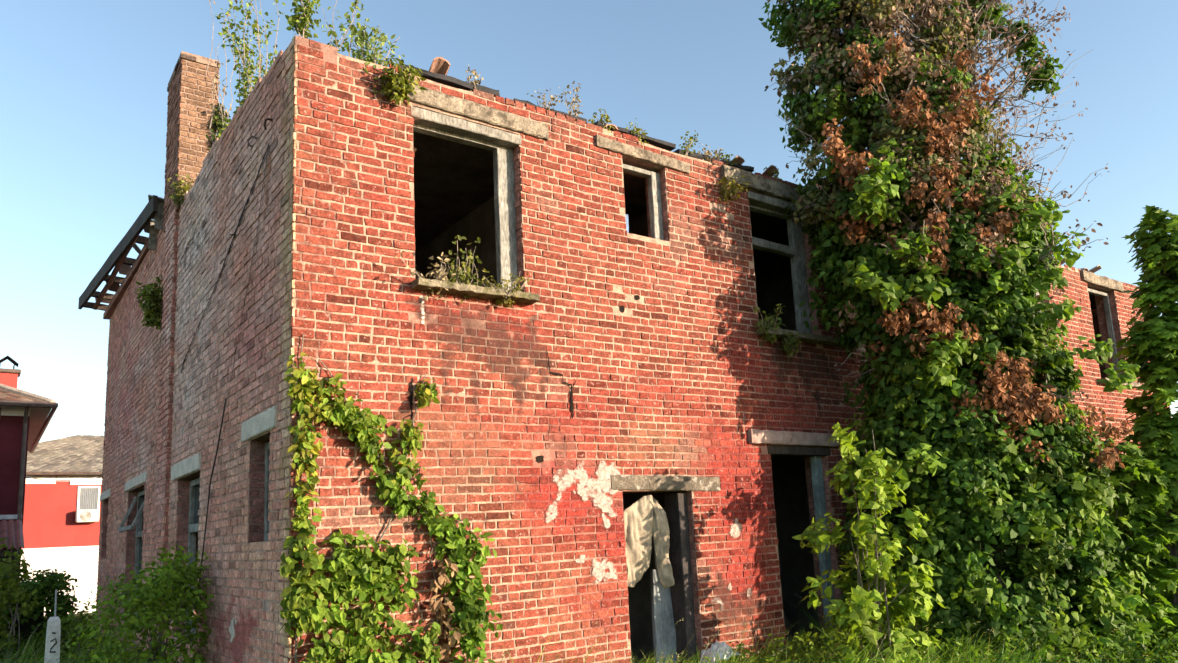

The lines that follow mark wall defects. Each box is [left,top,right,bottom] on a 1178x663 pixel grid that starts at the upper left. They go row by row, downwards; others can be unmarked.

spalling [546,461,620,528]
spalling [575,555,617,583]